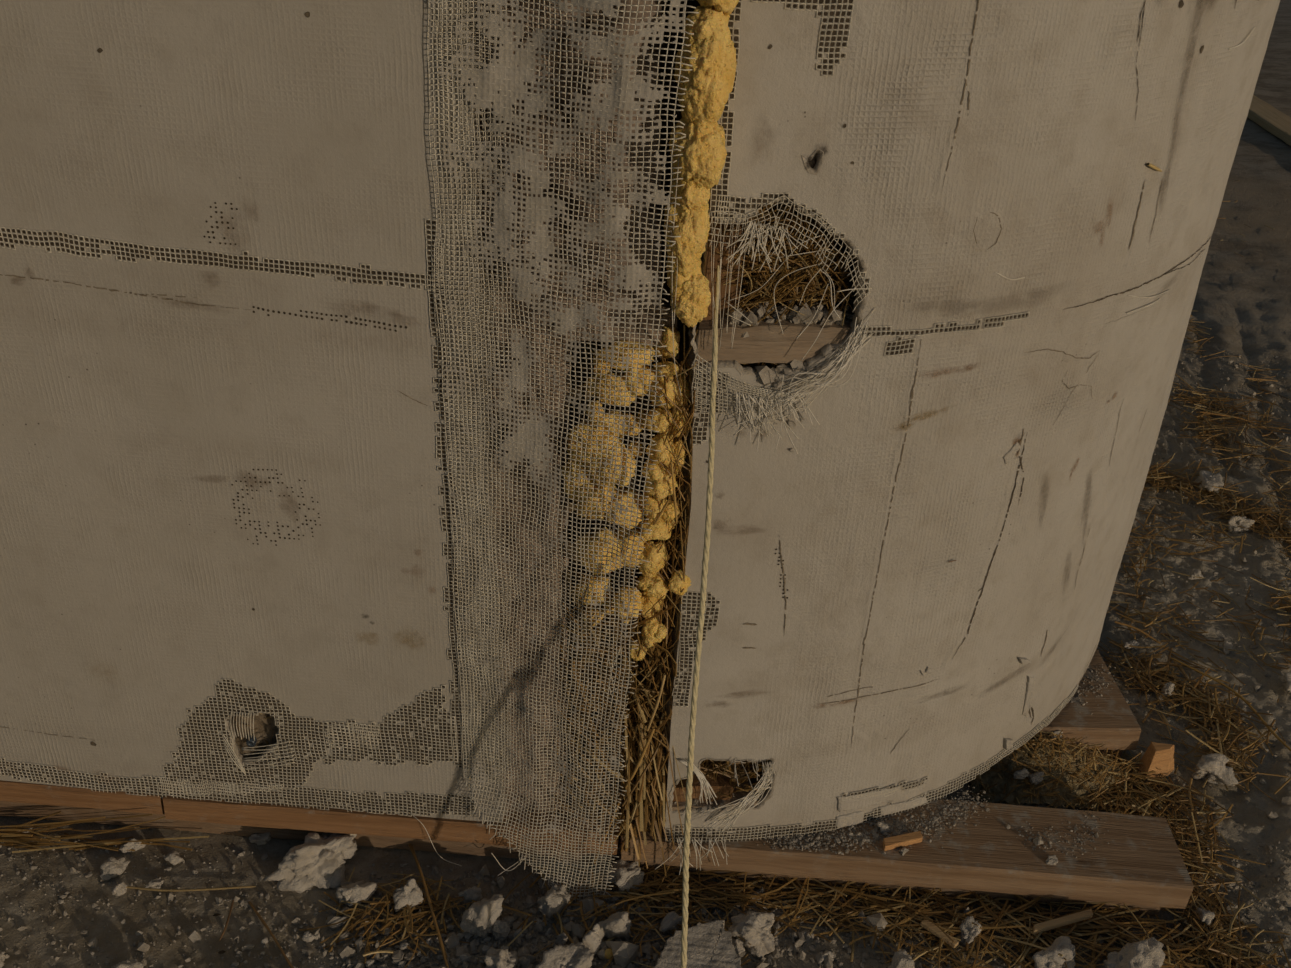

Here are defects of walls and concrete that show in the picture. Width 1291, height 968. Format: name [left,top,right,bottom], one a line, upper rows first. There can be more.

peeling [751,0,854,77]
spalling [474,103,509,820]
spalling [676,189,870,572]
crack [1066,220,1217,309]
peeling [158,678,458,796]
peeling [658,591,777,832]